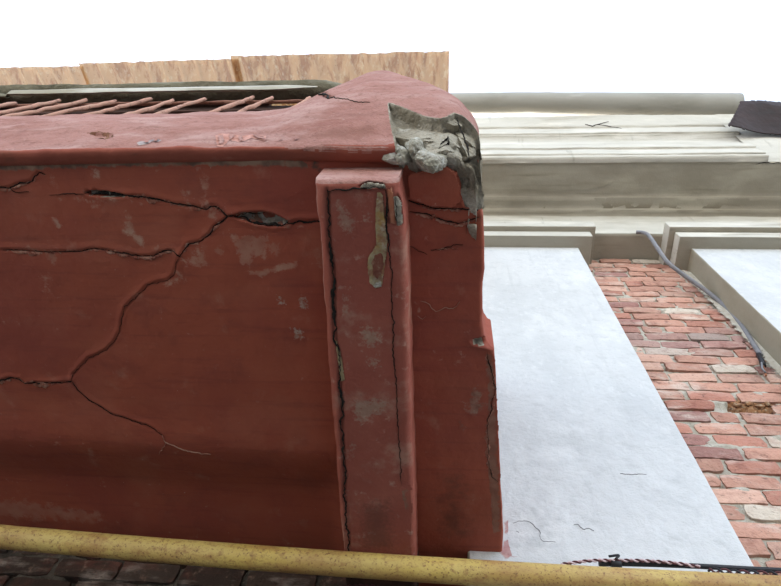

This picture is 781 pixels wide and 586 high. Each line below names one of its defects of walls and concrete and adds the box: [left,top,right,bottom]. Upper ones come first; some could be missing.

crack [318,93,370,103]
crack [0,172,45,193]
flaking render [328,110,485,288]
crack [409,200,479,254]
crack [0,194,235,455]
crack [286,189,350,551]
crack [385,197,402,483]
crack [485,354,498,482]
spalling [727,400,773,414]